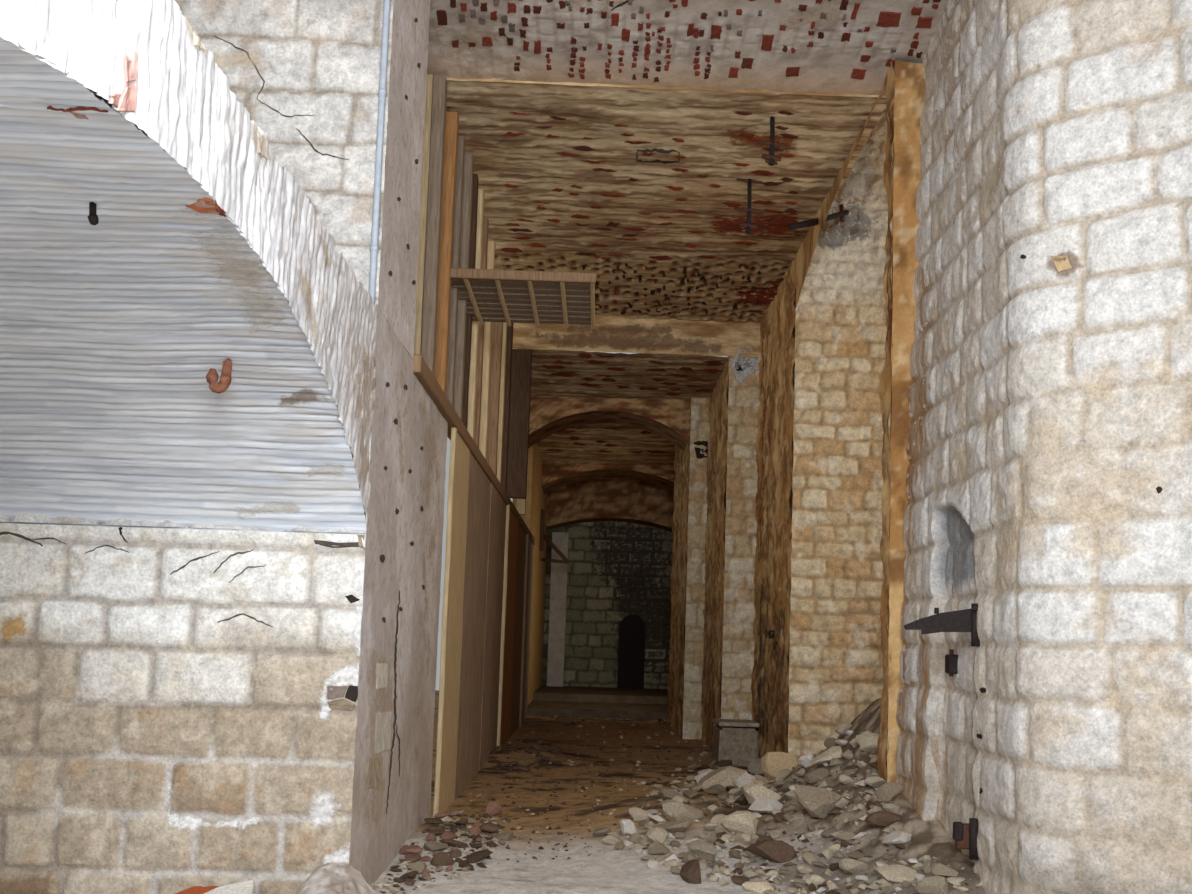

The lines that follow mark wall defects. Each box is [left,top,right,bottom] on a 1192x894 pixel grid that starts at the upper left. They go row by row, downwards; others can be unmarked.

crack [0,527,128,554]
crack [170,549,265,582]
crack [217,613,273,627]